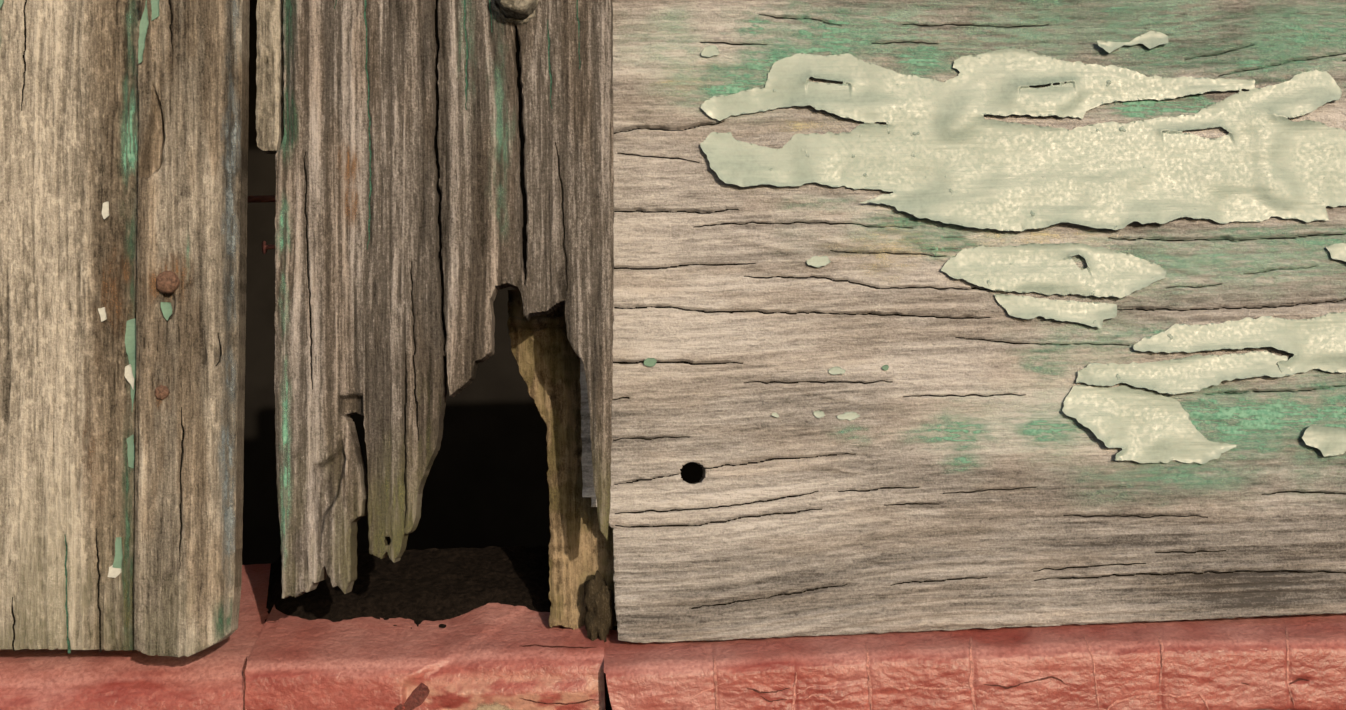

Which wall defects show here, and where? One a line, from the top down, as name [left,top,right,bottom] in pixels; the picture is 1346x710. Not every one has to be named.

crack [20,0,28,111]
crack [700,14,841,45]
crack [871,24,1049,44]
crack [1185,44,1346,77]
peeling [700,31,1346,328]
peeling [813,411,860,421]
peeling [1062,312,1346,464]
crack [747,636,1209,710]
crack [1285,627,1310,703]